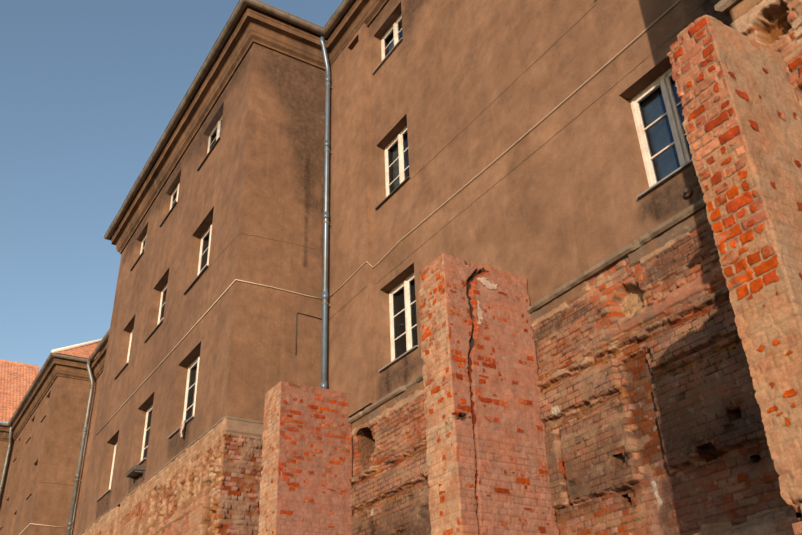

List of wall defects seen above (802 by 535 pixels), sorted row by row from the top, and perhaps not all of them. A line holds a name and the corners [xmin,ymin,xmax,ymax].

spalling [264,397,375,497]
crack [459,267,487,500]